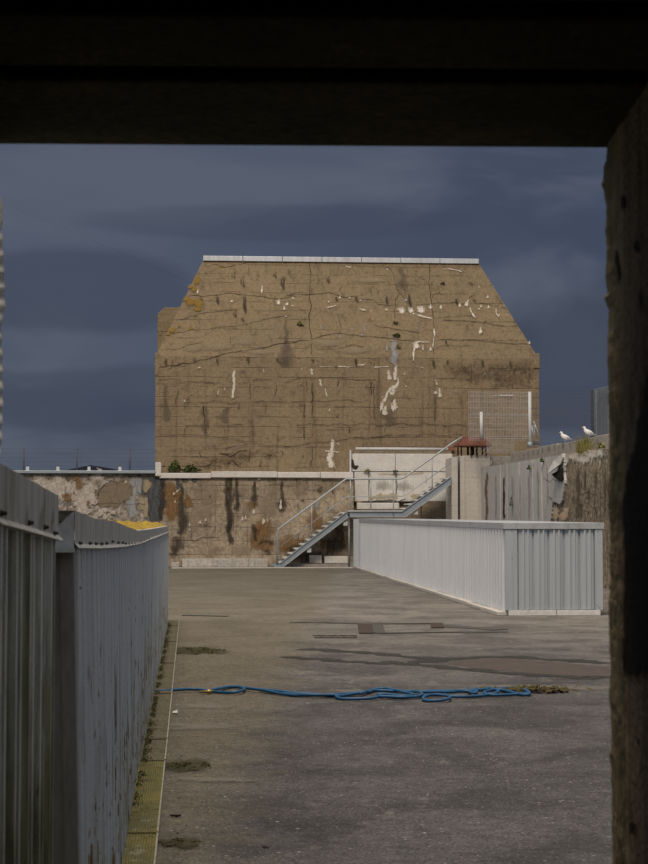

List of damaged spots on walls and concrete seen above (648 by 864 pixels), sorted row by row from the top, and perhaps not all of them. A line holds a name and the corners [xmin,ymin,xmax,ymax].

crack [159,262,532,558]
damp [374,340,407,415]
peeling [33,468,148,520]
damp [225,478,273,554]
damp [290,525,344,561]